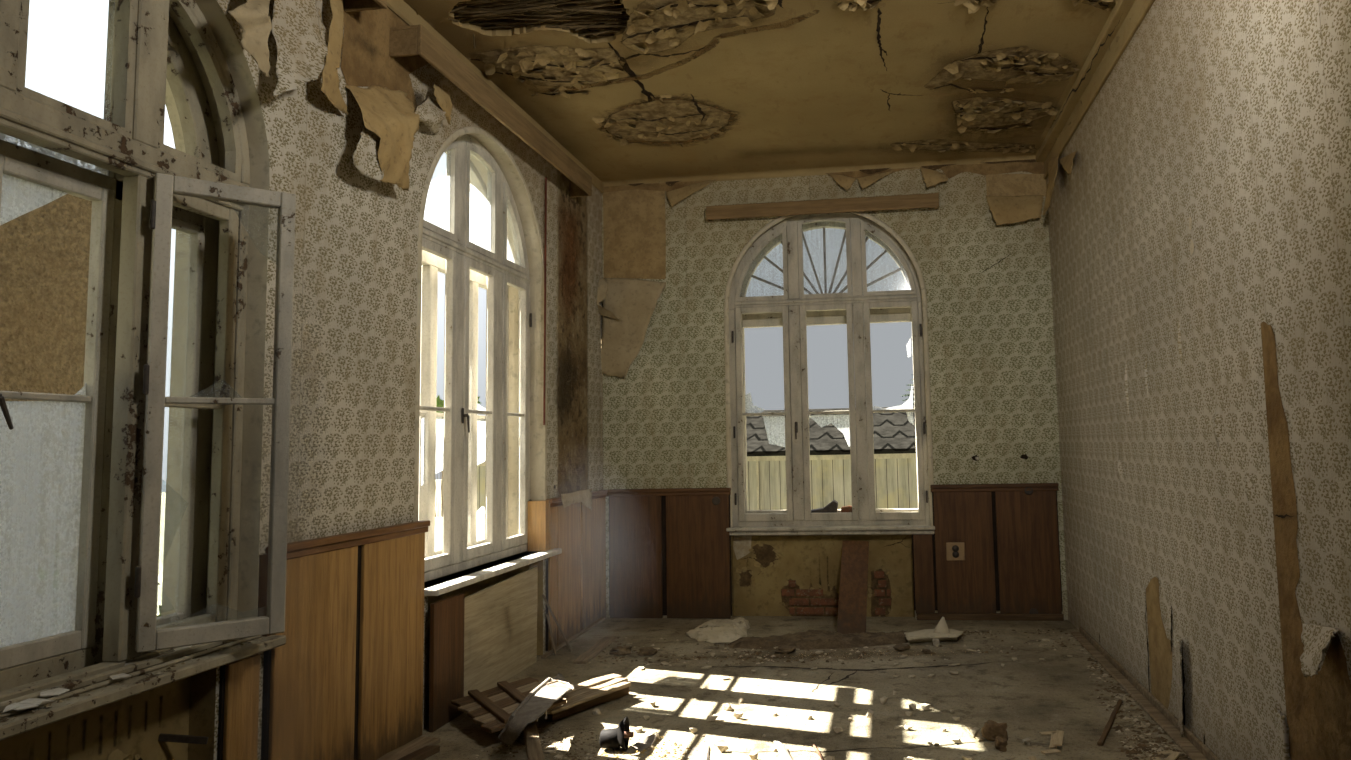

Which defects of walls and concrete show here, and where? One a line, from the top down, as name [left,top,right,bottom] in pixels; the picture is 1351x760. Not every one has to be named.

peeling [1072,0,1119,12]
peeling [341,0,778,108]
crack [608,43,710,102]
crack [876,0,923,111]
peeling [925,45,1079,133]
peeling [981,159,1047,196]
flaking render [734,541,783,588]
flaking render [779,579,839,617]
flaking render [868,565,895,617]